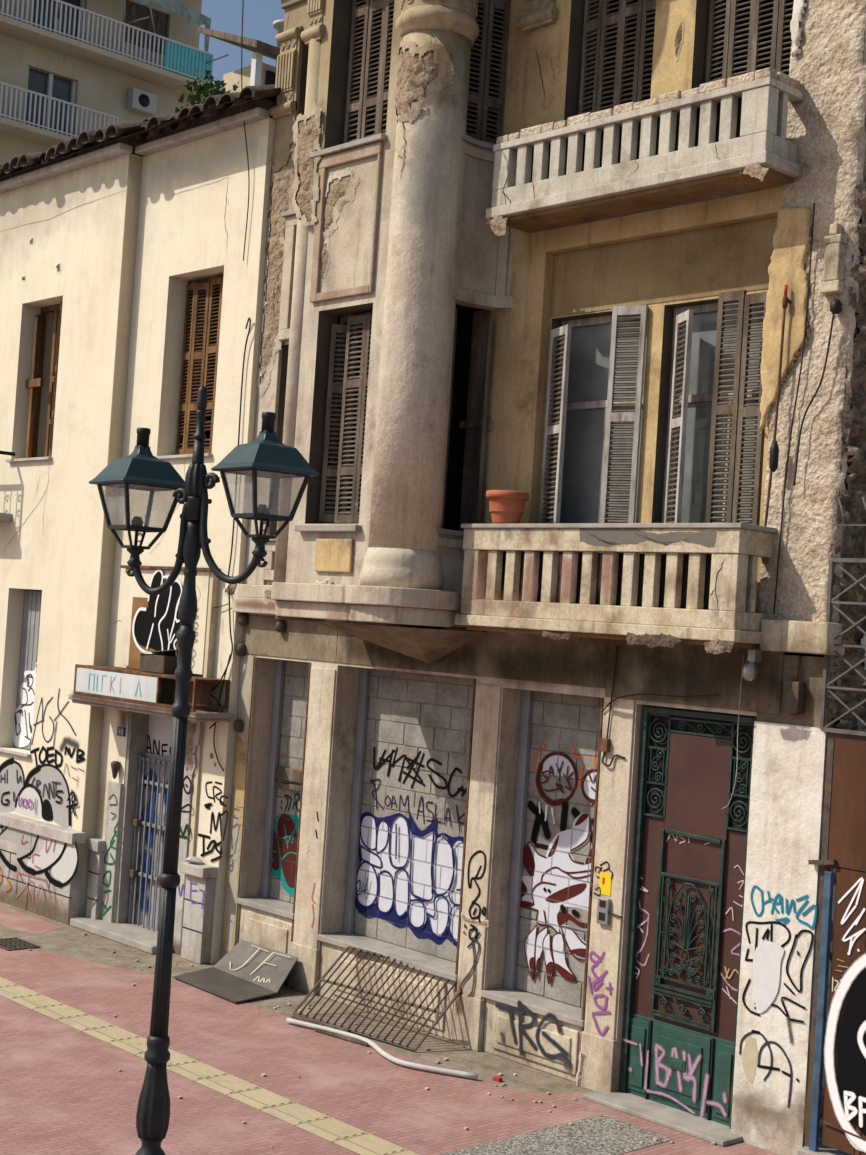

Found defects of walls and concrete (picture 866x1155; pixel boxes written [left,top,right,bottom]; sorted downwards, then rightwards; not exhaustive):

peeling [790,0,807,57]
flaking render [394,40,451,123]
flaking render [257,102,361,397]
peeling [759,206,812,433]
peeling [579,528,717,547]
flaking render [626,632,682,648]